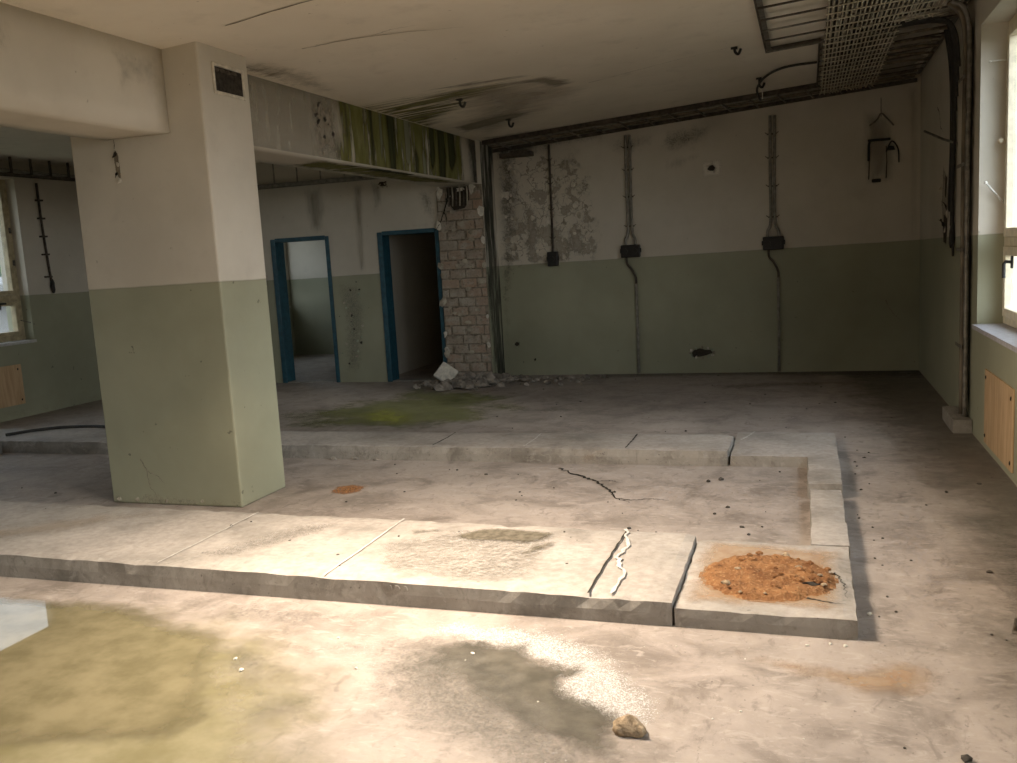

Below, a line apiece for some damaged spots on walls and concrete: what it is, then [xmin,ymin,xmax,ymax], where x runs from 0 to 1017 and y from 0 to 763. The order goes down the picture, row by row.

crack [225,0,312,26]
peeling [498,157,596,262]
spalling [436,184,493,381]
corrosion [332,485,363,494]
crack [559,468,660,501]
crack [587,529,630,593]
leakage [319,620,662,763]